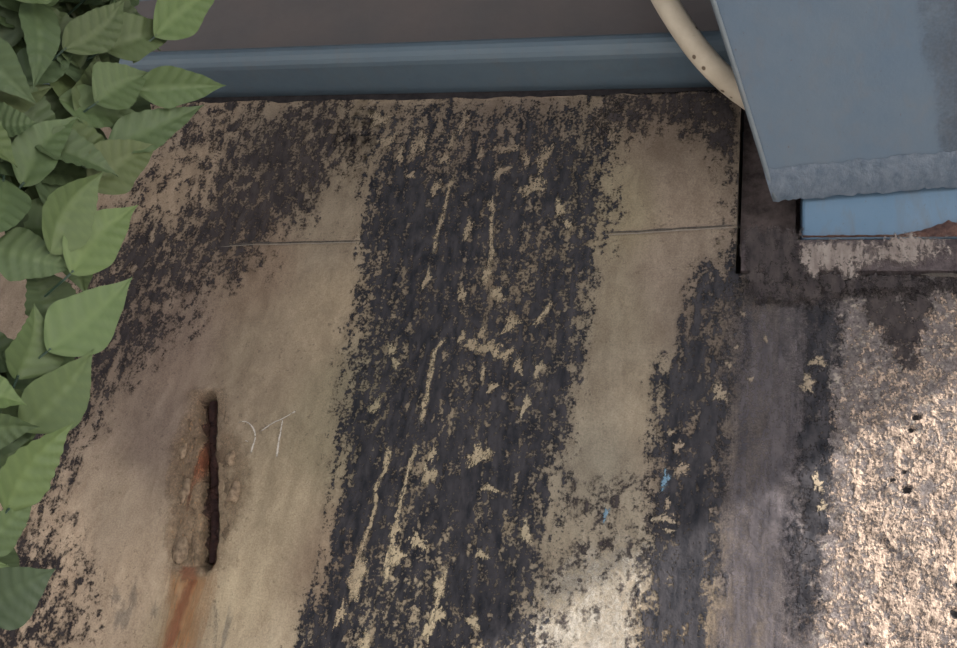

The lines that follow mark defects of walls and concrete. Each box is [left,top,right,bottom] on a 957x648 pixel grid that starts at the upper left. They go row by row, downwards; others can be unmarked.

spalling [167,395,241,578]
leakage [16,90,740,648]
leakage [602,223,957,648]
leakage [0,577,90,648]
corrosion [161,574,204,648]